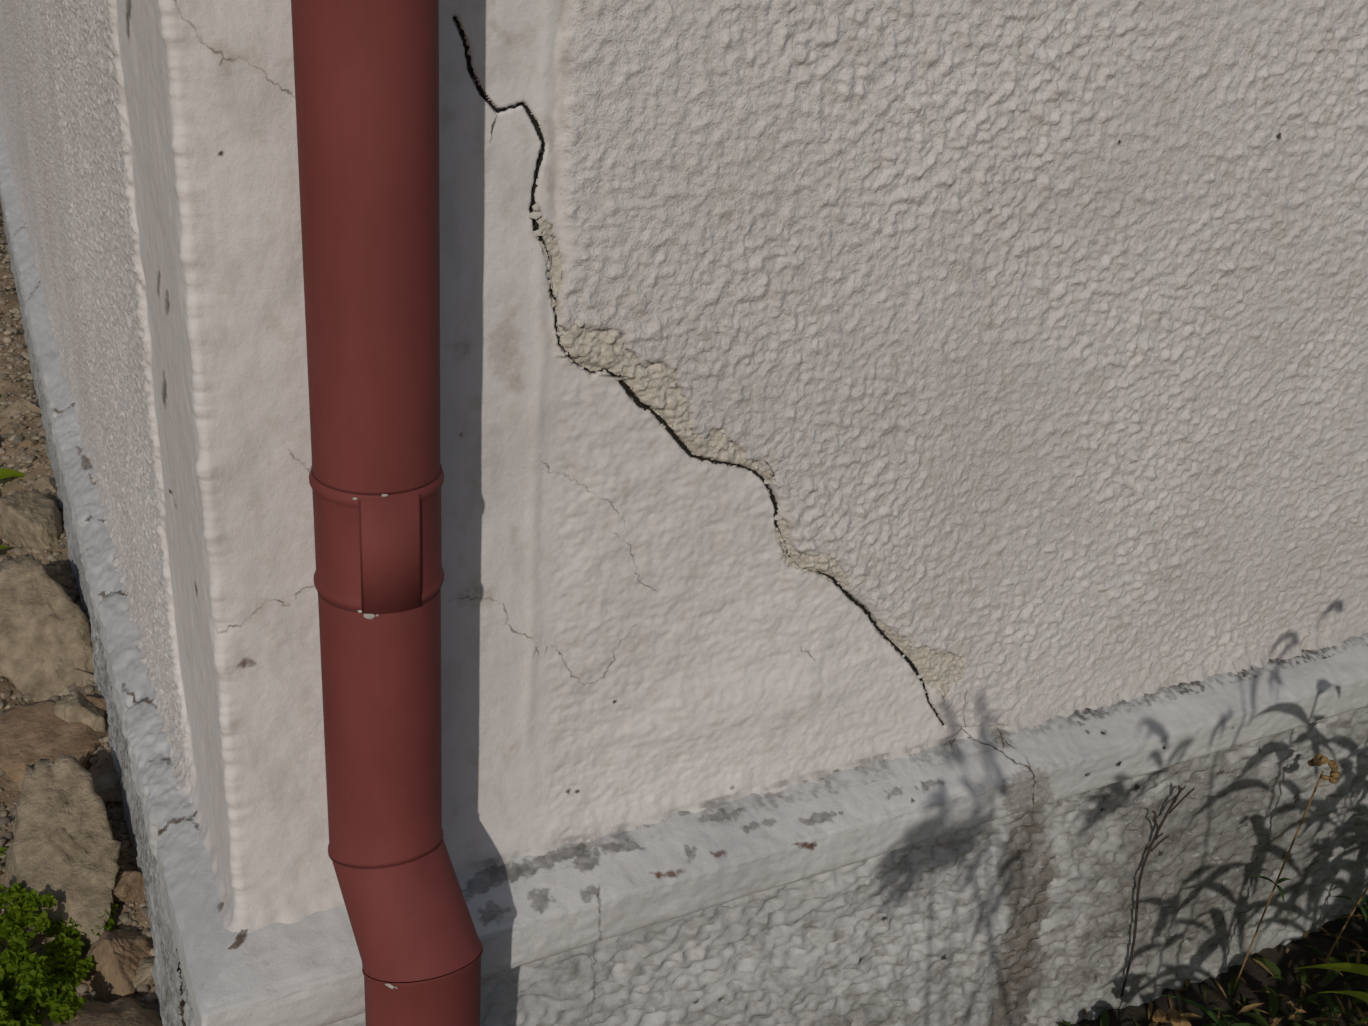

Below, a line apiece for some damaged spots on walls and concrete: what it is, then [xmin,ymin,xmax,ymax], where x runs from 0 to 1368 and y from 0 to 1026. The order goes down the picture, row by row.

crack [453,16,1044,811]
spalling [774,515,849,588]
spalling [877,621,965,698]